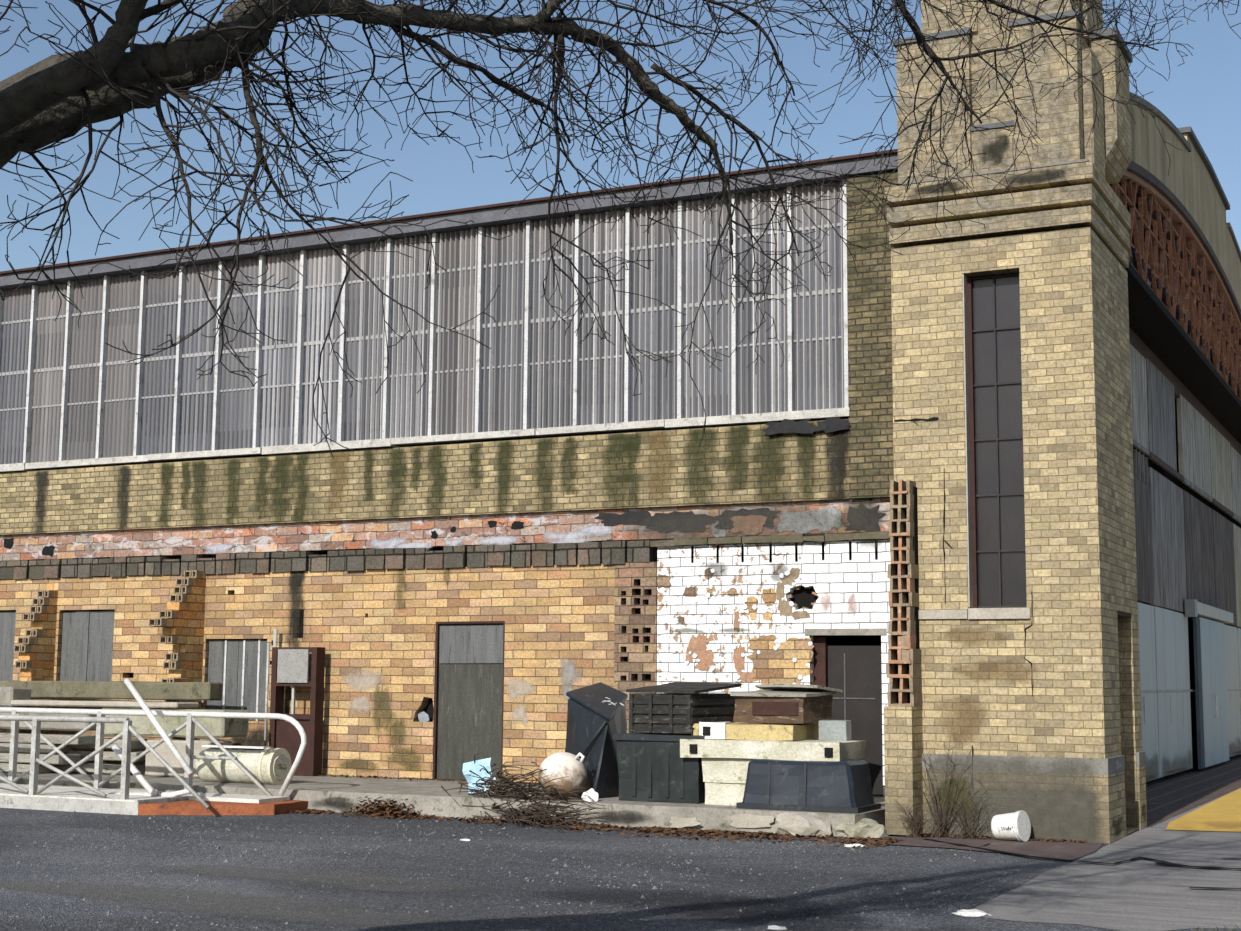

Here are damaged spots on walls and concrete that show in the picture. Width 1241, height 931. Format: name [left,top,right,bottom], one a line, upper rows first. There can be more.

damp [36,471,48,533]
damp [118,466,130,529]
damp [160,462,206,527]
damp [257,455,308,523]
damp [390,446,446,518]
damp [498,441,512,513]
spalling [488,520,524,529]
peeling [711,522,727,538]
damp [686,423,849,504]
peeling [778,506,842,534]
peeling [657,567,819,690]
crack [1024,592,1033,697]